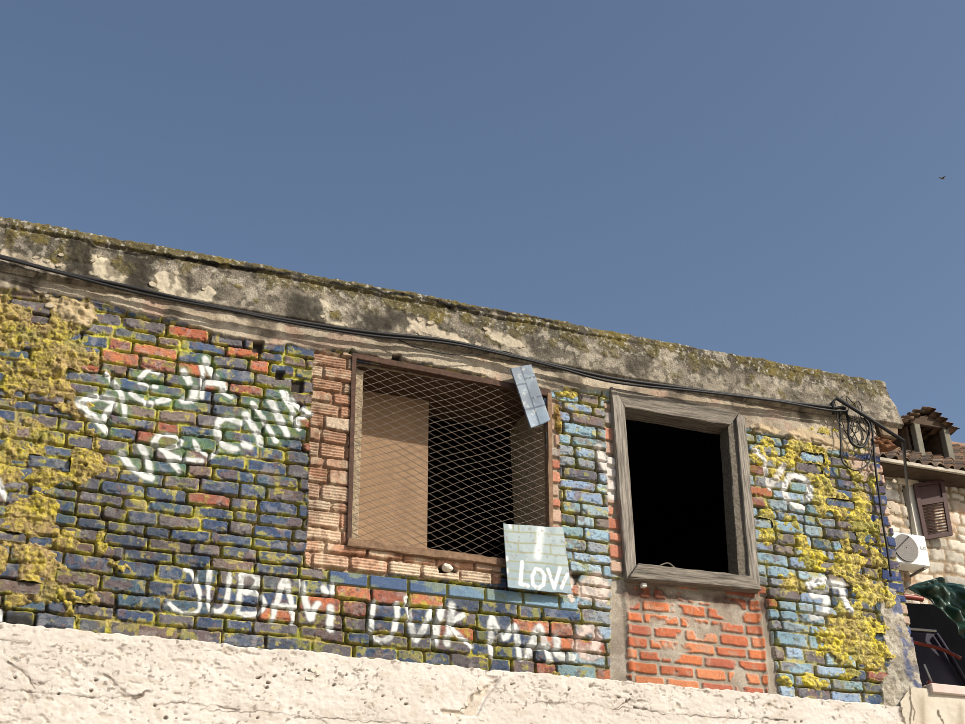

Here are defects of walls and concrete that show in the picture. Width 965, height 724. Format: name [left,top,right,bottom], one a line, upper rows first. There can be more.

peeling [89,254,128,282]
damp [287,294,324,322]
peeling [407,317,525,348]
crack [0,639,44,693]
crack [613,702,788,721]